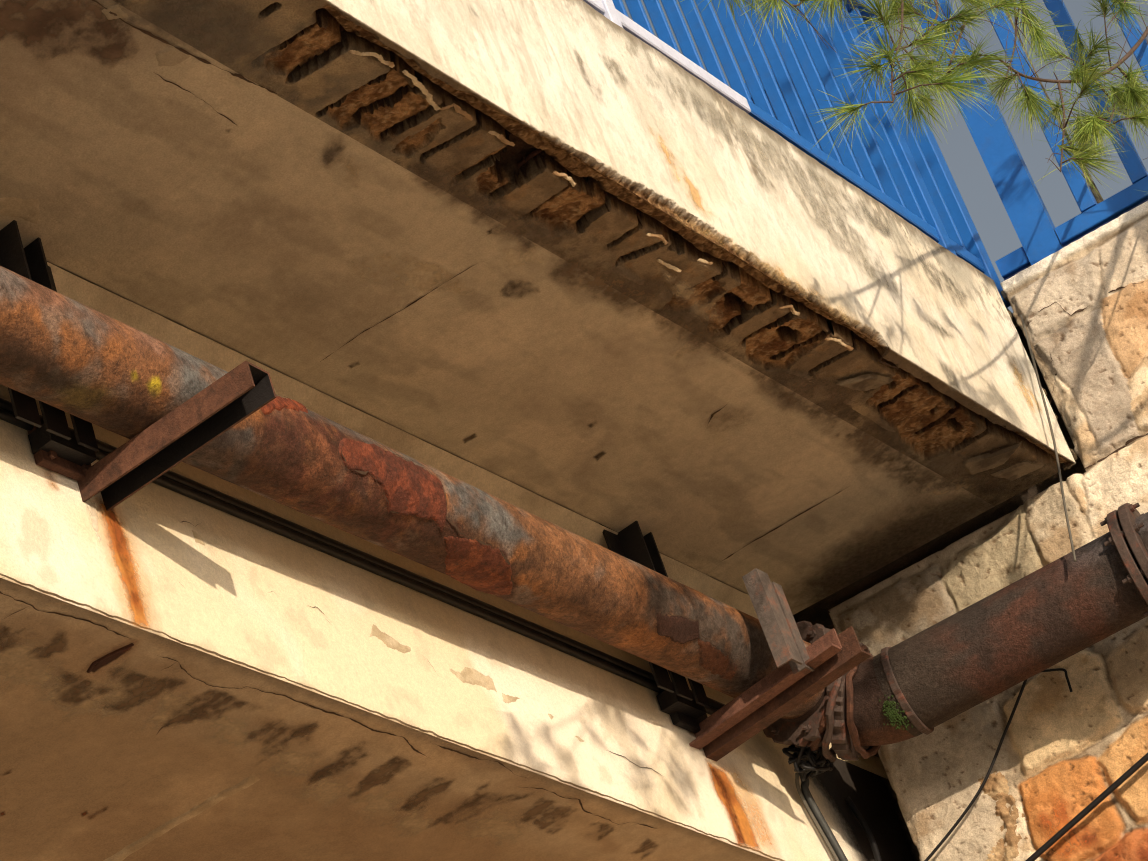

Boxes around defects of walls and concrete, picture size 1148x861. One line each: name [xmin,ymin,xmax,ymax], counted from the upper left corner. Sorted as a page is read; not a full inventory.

leakage [0,0,128,64]
peeling [102,3,129,20]
crack [92,0,284,97]
crack [155,73,235,124]
peeling [262,4,1075,481]
corrosion [100,503,148,626]
crack [0,577,131,639]
peeling [369,624,411,653]
peeling [450,667,519,703]
leakage [0,627,570,837]
corrosion [708,763,772,848]